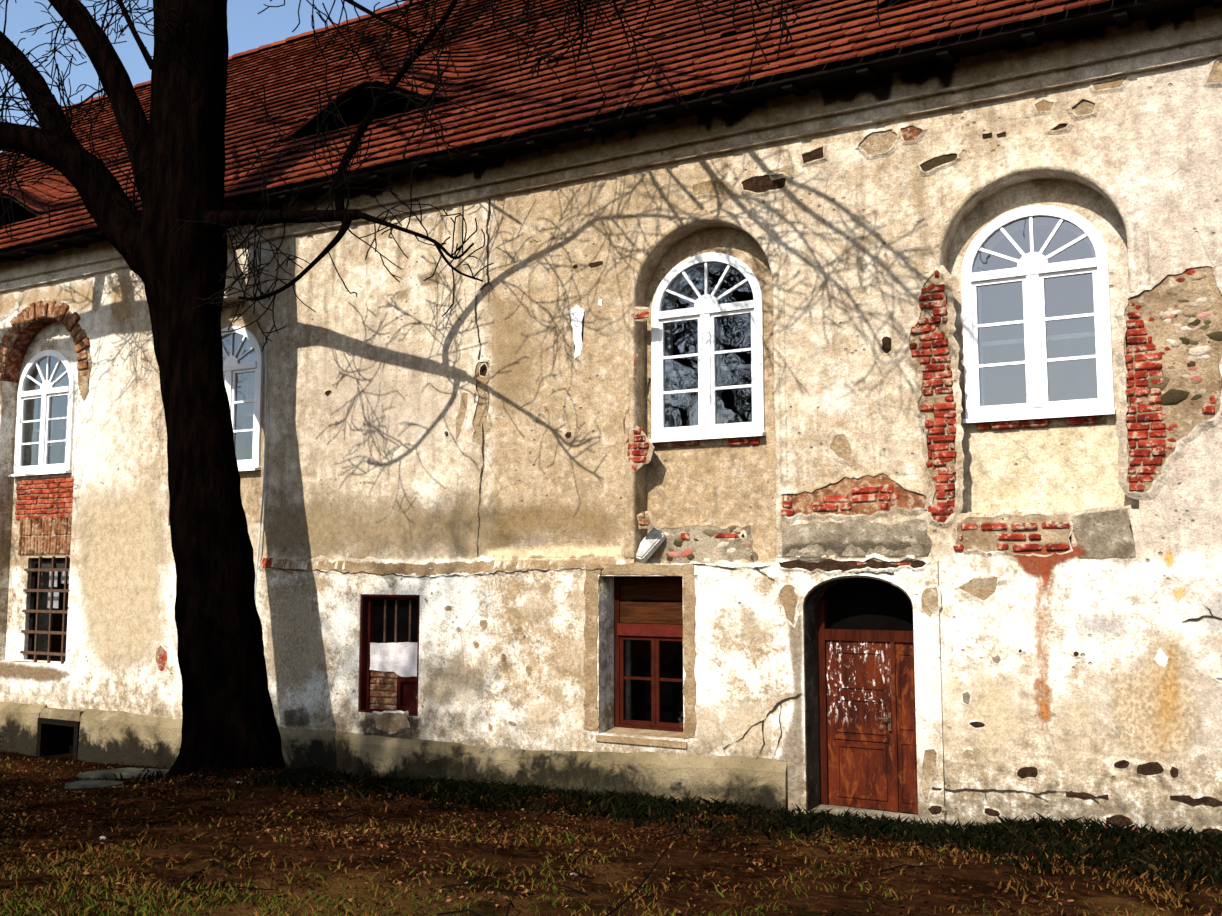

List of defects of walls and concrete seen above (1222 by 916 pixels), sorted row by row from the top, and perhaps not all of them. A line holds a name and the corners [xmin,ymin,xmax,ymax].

spalling [1031,74,1134,135]
spalling [689,143,830,201]
spalling [854,122,929,160]
spalling [916,149,962,178]
crack [474,199,494,360]
spalling [1113,260,1222,501]
flaking render [624,425,654,472]
flaking render [773,265,1074,628]
spalling [637,511,758,564]
corrosion [1013,545,1085,723]
crack [1182,606,1222,623]
crack [723,693,801,759]